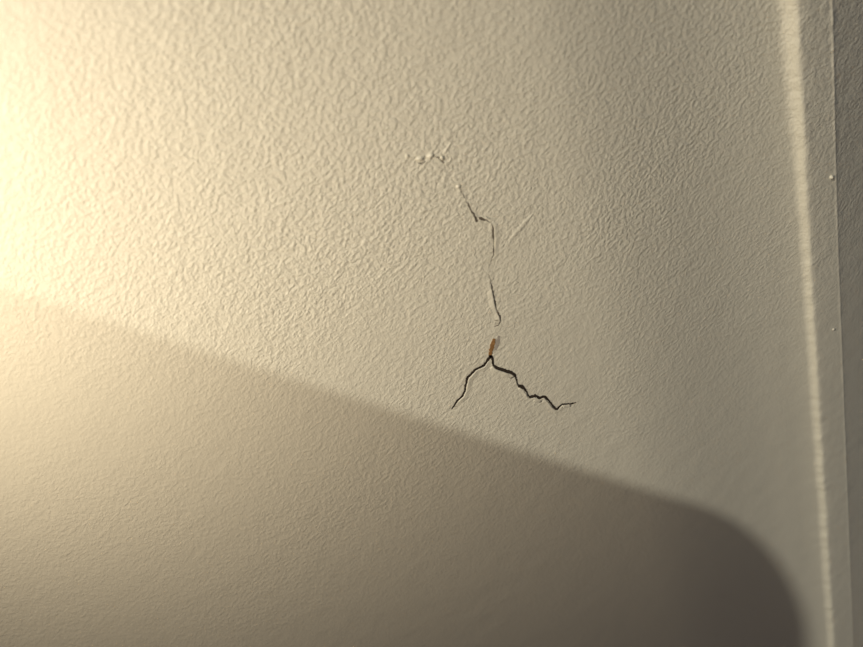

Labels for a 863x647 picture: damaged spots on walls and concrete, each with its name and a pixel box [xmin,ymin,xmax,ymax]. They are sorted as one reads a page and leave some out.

crack [451,184,576,414]